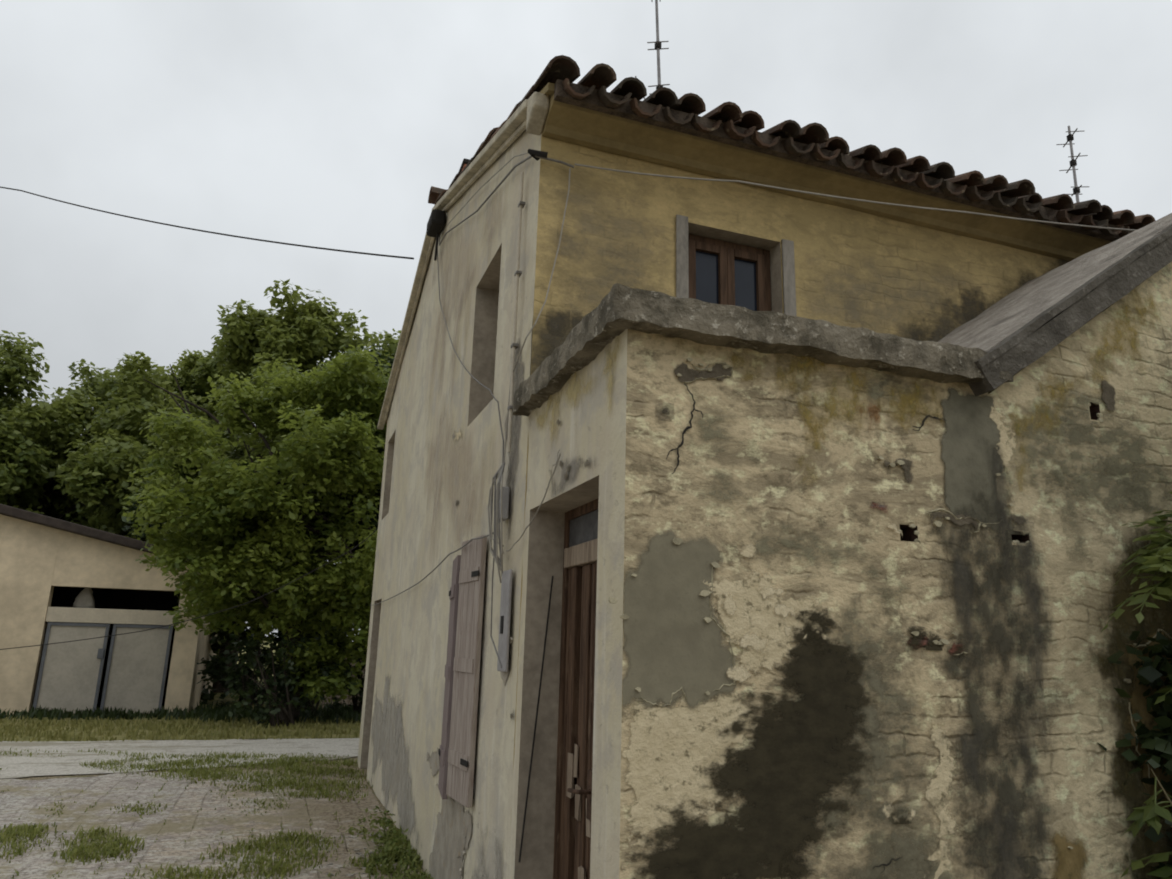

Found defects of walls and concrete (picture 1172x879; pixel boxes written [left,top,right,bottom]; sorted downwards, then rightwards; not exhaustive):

damp [531,312,582,374]
crack [666,383,703,474]
flaking render [674,358,733,384]
spalling [1088,380,1116,423]
flaking render [878,456,913,483]
spalling [927,406,1030,545]
spalling [870,502,921,543]
flaking render [608,531,828,708]
damp [630,394,1172,879]
flaking render [908,626,967,658]